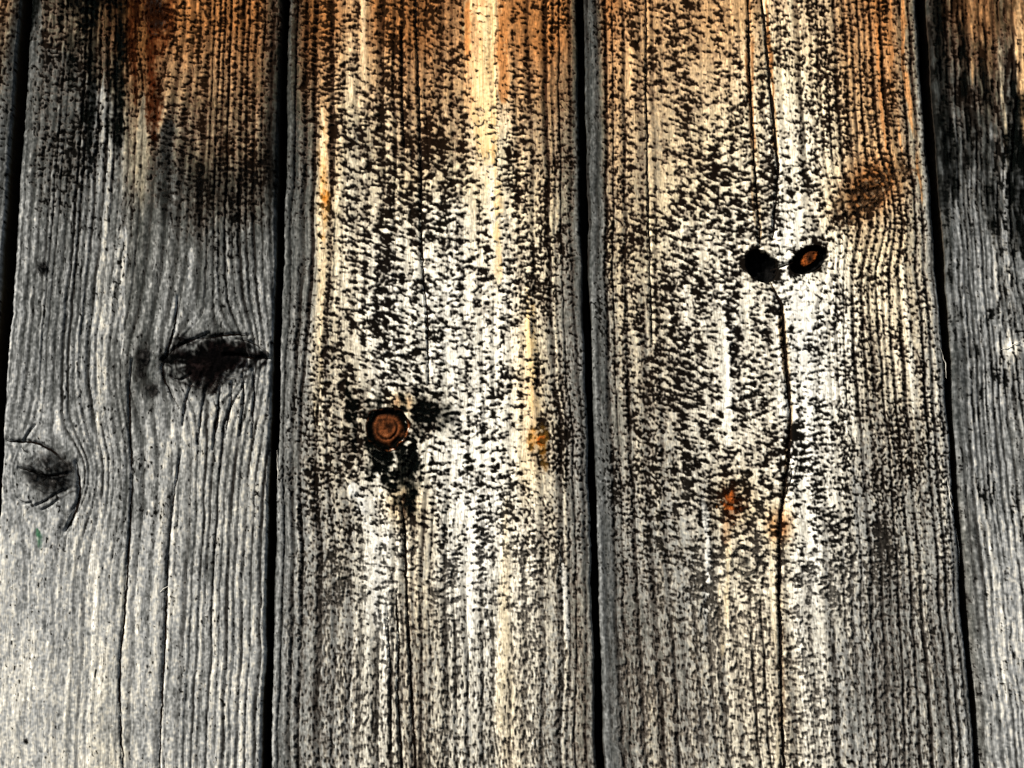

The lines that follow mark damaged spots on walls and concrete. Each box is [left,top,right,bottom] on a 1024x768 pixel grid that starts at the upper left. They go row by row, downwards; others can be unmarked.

crack [747,0,780,244]
crack [769,262,793,768]